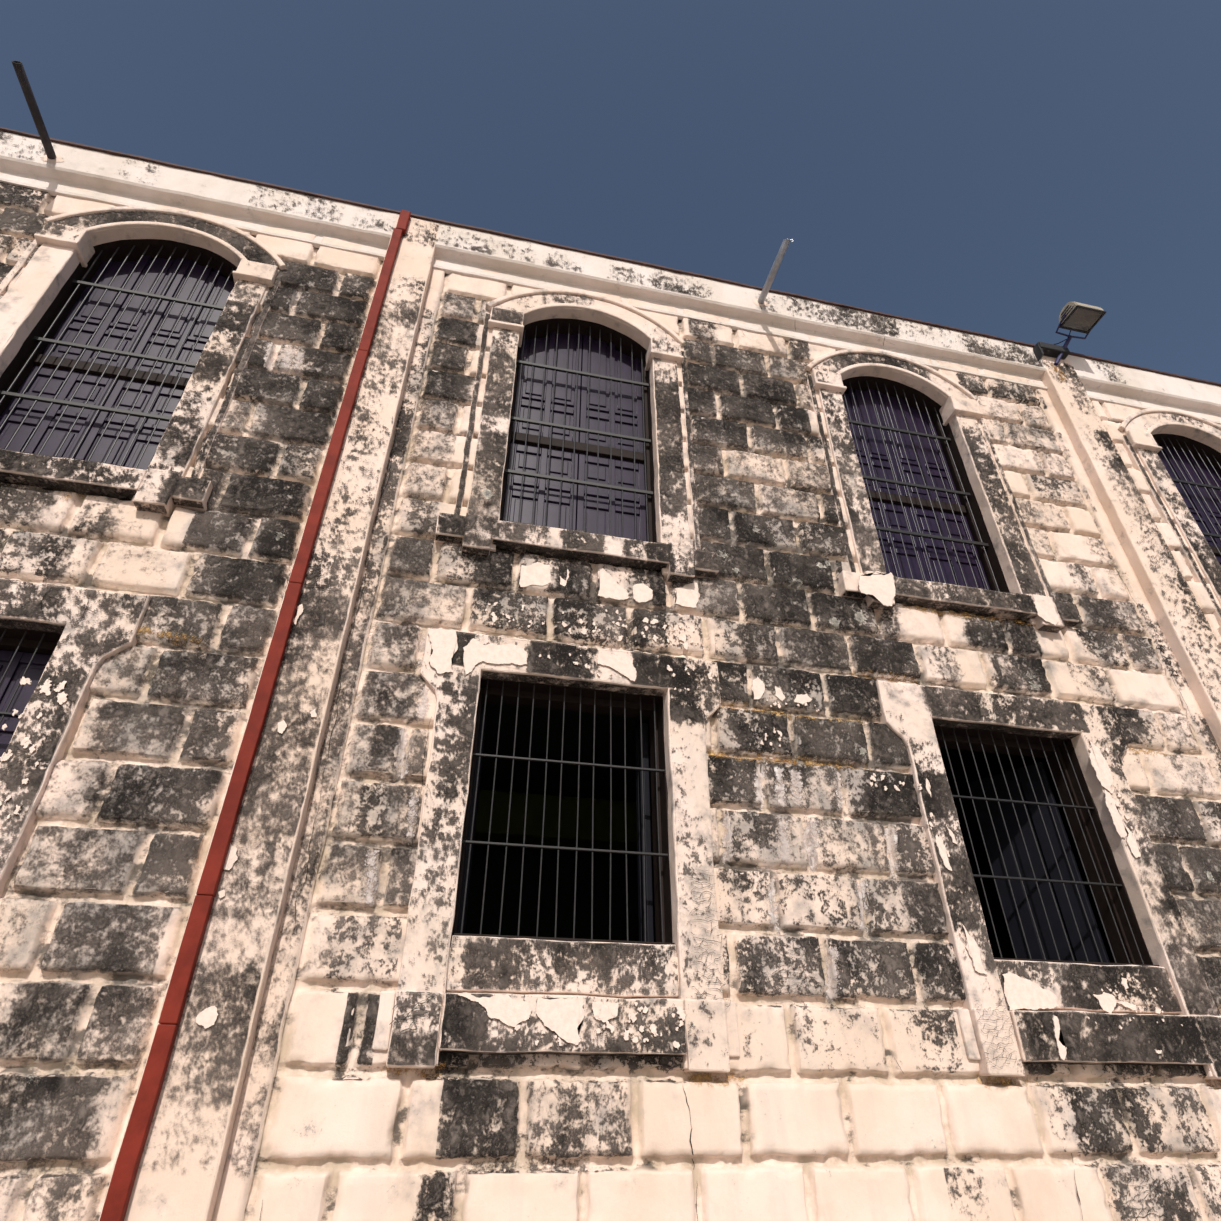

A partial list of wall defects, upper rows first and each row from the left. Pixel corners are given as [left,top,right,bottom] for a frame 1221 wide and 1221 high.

leakage [353,213,582,272]
leakage [608,265,711,297]
peeling [519,562,569,587]
peeling [675,582,700,608]
peeling [428,628,551,675]
peeling [562,568,653,682]
peeling [641,617,693,650]
leakage [0,182,375,1221]
peeling [458,992,686,1049]
peeling [1002,971,1067,1060]
peeling [1087,978,1165,1030]
crack [683,1088,698,1219]